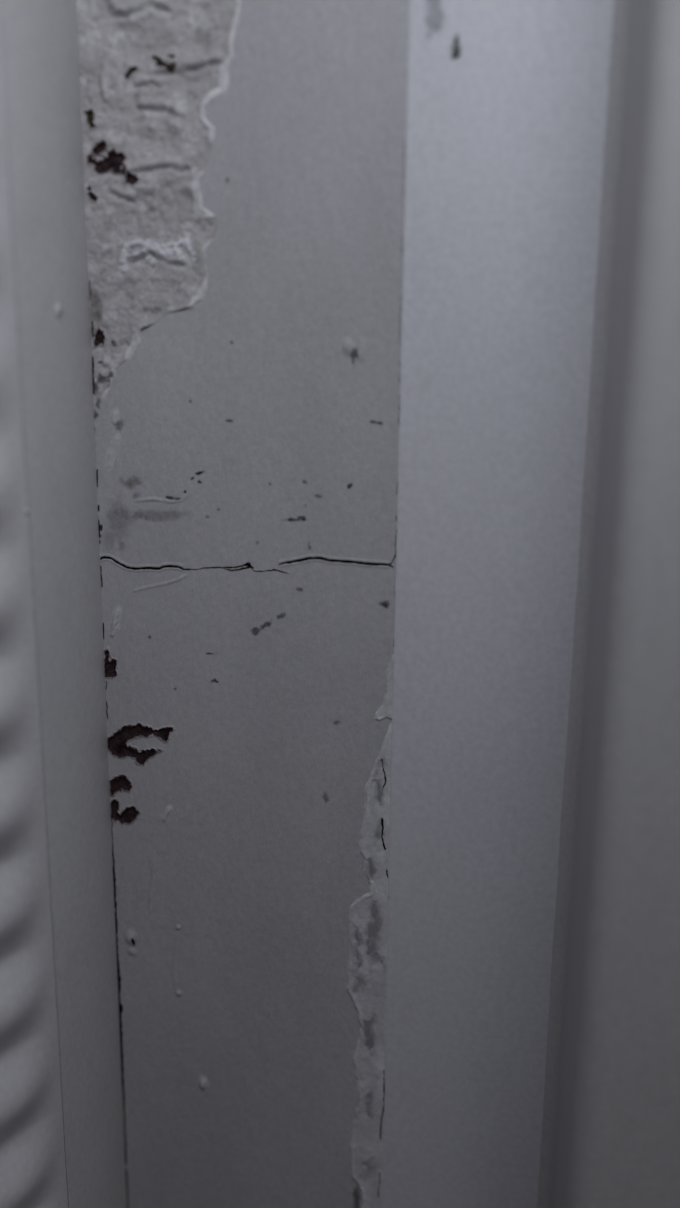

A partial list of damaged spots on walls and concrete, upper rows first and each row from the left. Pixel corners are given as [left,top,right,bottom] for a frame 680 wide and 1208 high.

crack [88,281,96,395]
peeling [77,0,241,403]
crack [96,469,398,588]
peeling [346,654,394,1208]